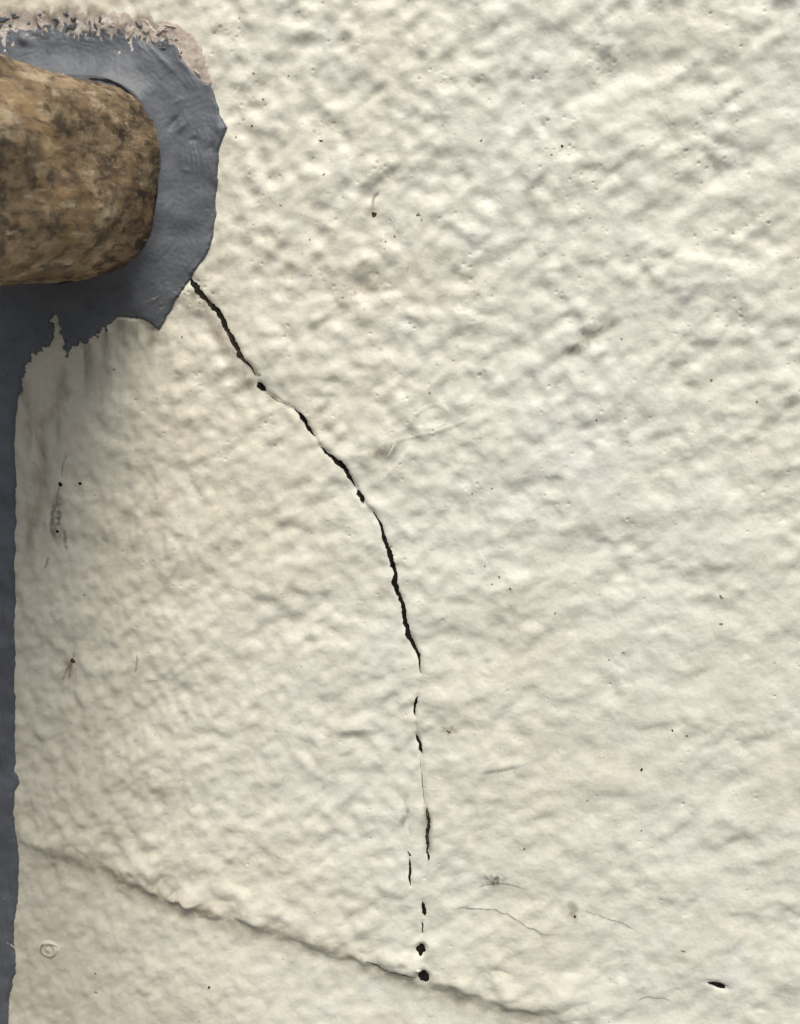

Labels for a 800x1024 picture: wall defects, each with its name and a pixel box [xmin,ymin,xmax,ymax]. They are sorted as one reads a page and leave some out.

peeling [0,5,212,85]
crack [190,278,431,932]